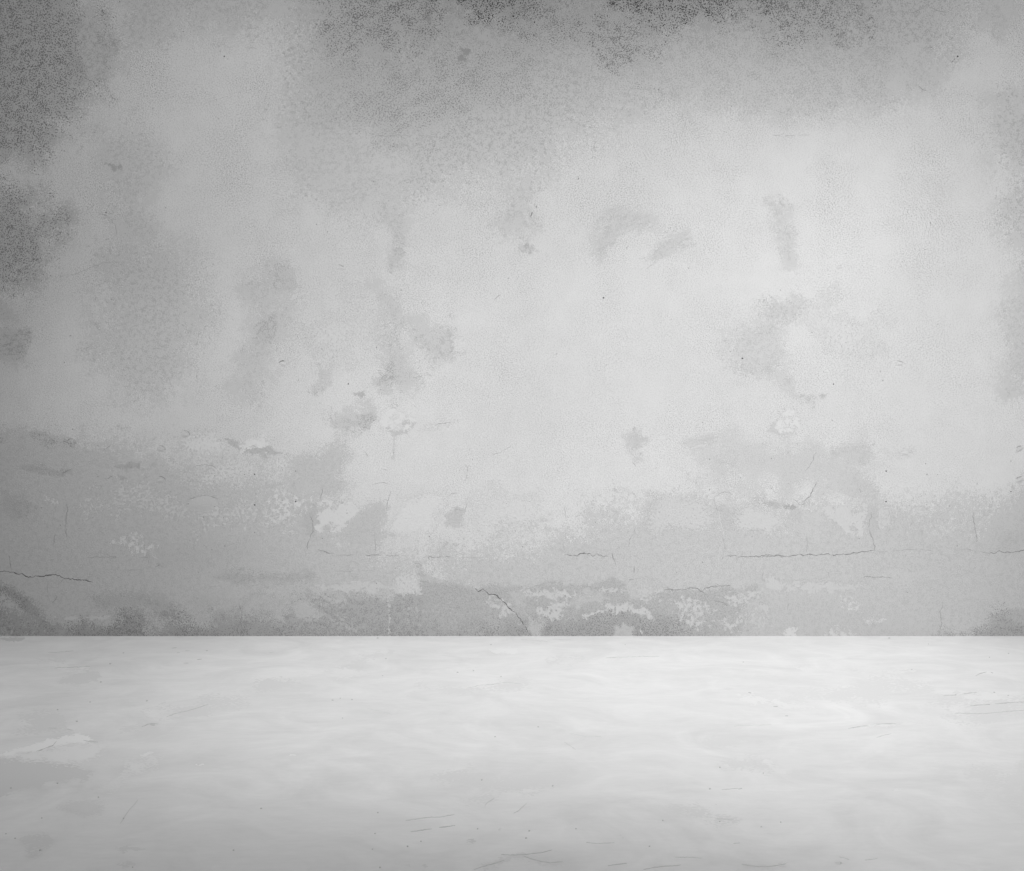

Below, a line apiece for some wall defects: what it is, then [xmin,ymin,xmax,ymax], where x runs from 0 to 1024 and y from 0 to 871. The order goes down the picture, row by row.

water stain [0,0,1024,642]
crack [714,492,931,581]
crack [0,554,116,603]
crack [475,588,560,642]
peeling [483,586,772,635]